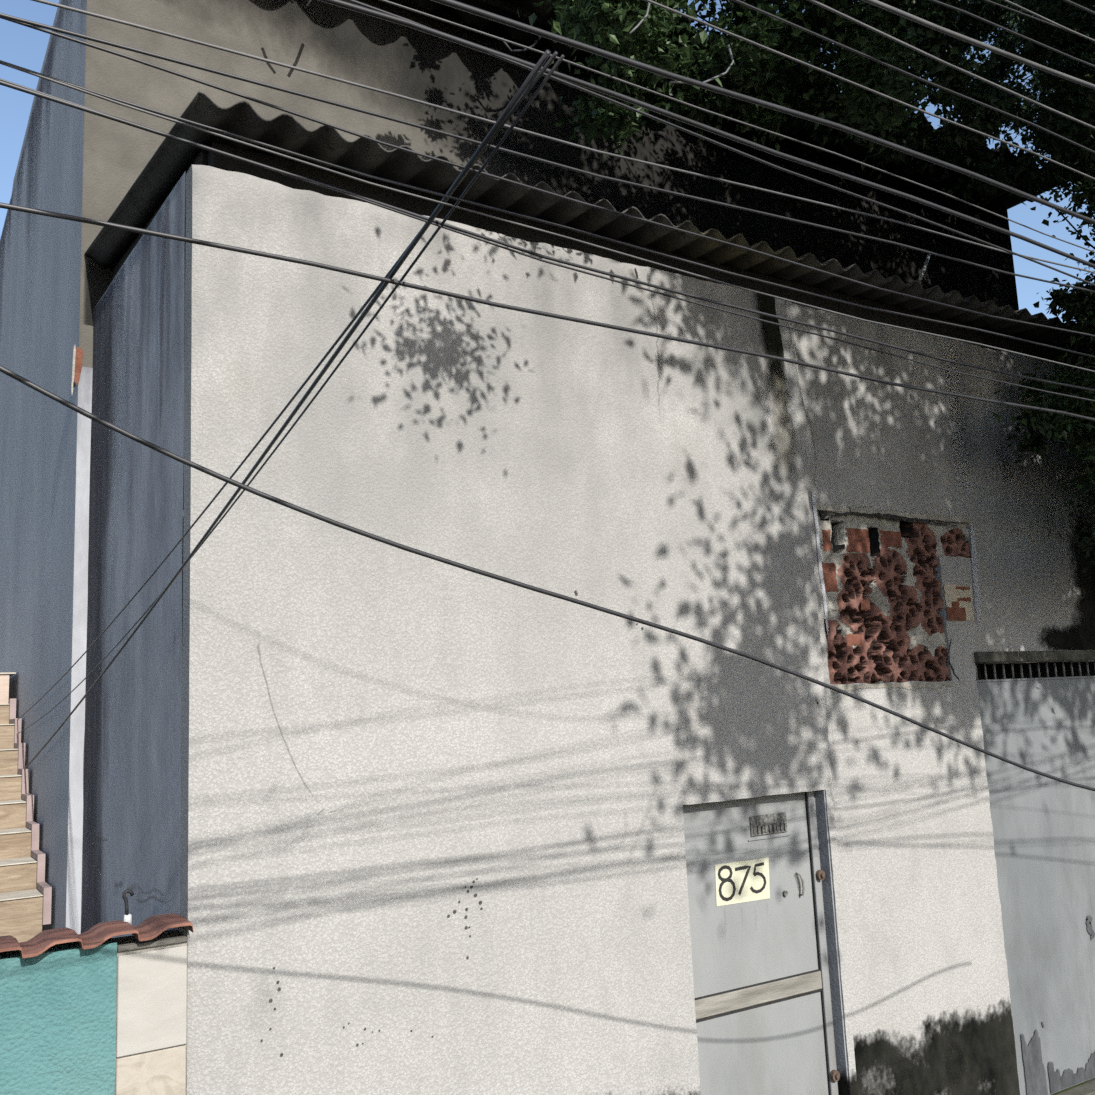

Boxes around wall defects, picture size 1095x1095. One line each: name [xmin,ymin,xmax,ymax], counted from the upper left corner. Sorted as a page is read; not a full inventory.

water stain [756,293,786,401]
flaking render [812,492,980,631]
flaking render [831,681,953,694]
water stain [837,1002,1020,1095]